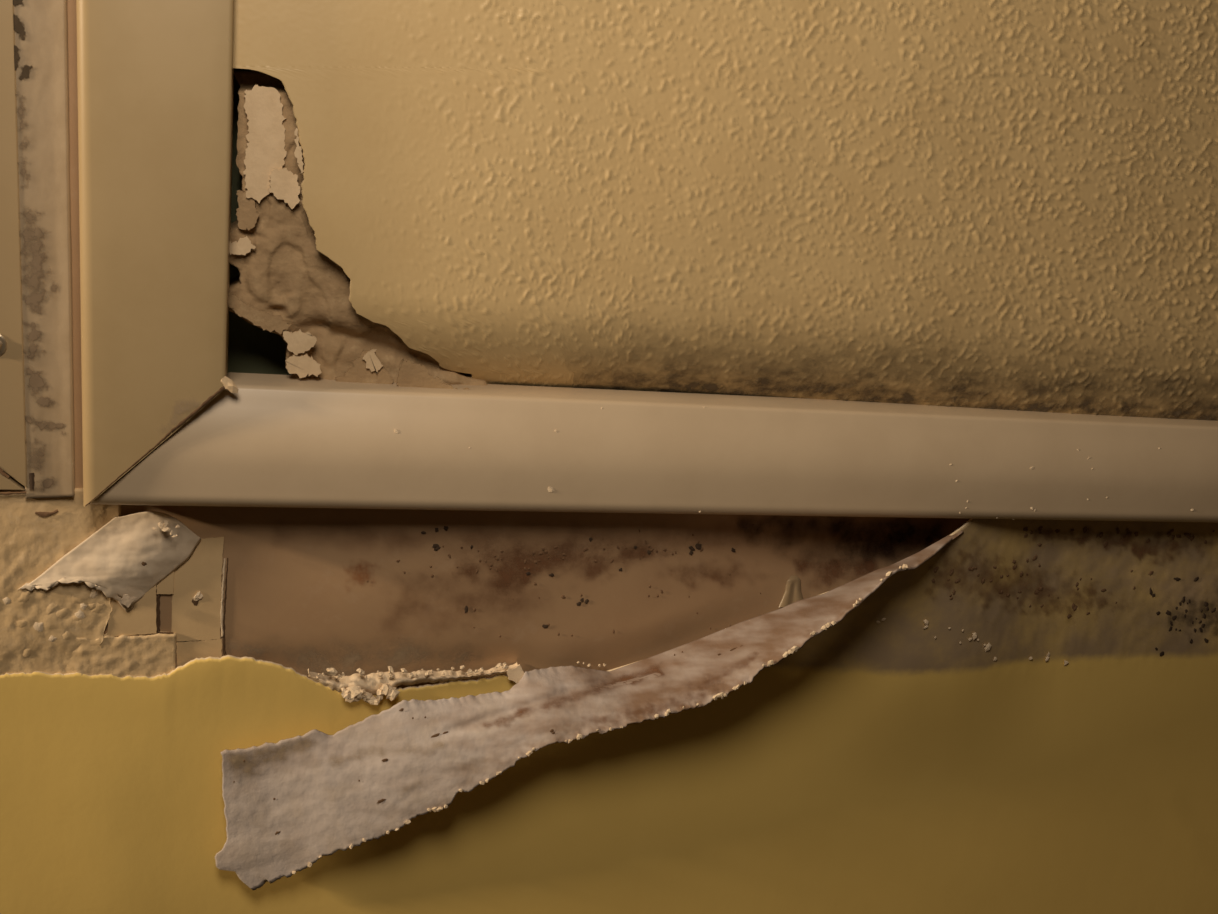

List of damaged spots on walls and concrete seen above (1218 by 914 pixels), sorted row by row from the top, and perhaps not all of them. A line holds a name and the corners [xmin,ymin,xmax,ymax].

spalling [228,68,487,390]
peeling [18,511,224,667]
water stain [421,526,703,600]
water stain [740,518,940,583]
peeling [923,619,997,661]
water stain [932,526,1156,607]
water stain [1156,596,1217,643]
peeling [215,530,964,891]